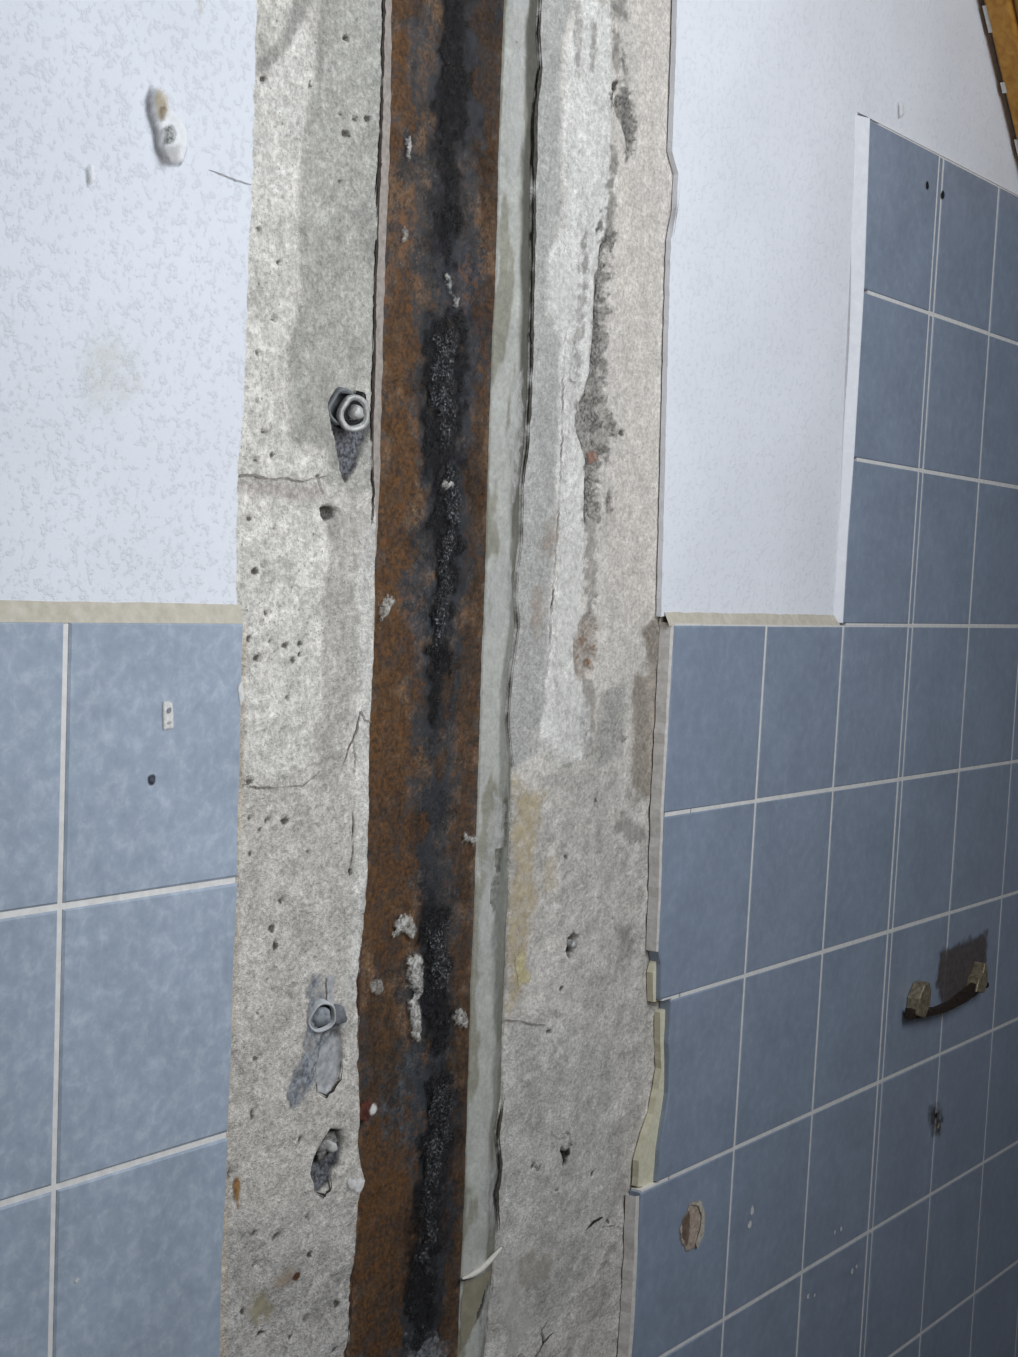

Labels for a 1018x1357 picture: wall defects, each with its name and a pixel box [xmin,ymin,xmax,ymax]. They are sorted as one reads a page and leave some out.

spalling [570,29,637,550]
water stain [544,204,596,481]
crack [508,0,567,765]
spalling [331,424,365,482]
spalling [316,474,333,520]
water stain [553,527,650,800]
peeling [394,914,415,939]
peeling [409,994,422,1042]
peeling [454,1008,468,1028]
rust [360,1099,377,1121]
spalling [310,1129,339,1197]
crack [495,1098,505,1230]